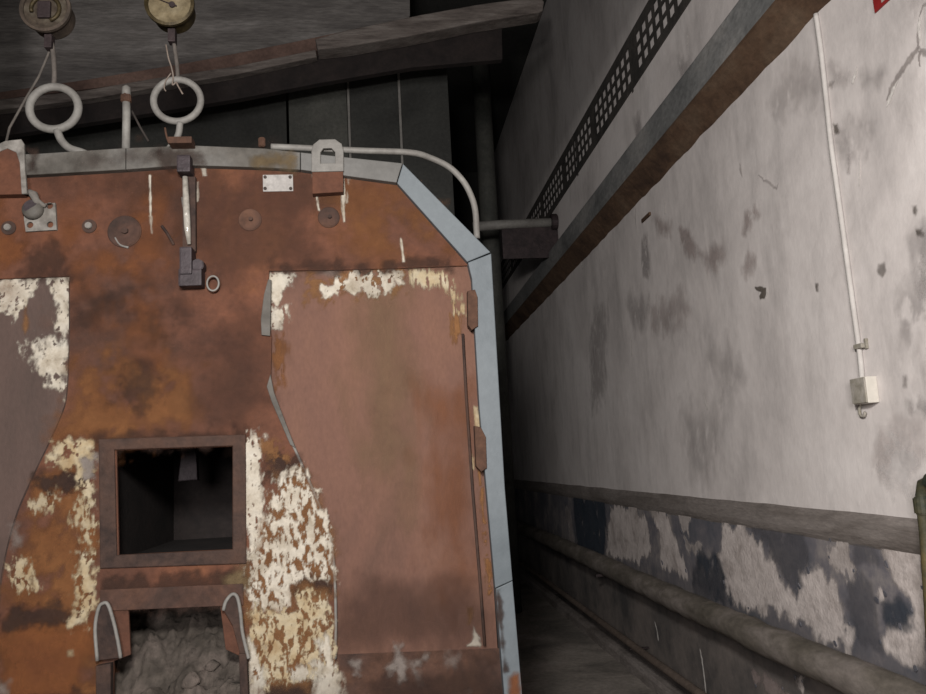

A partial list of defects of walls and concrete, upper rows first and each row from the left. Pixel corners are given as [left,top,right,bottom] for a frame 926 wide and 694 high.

crack [886,3,926,107]
peeling [606,504,702,581]
peeling [716,523,856,655]
peeling [879,549,926,672]